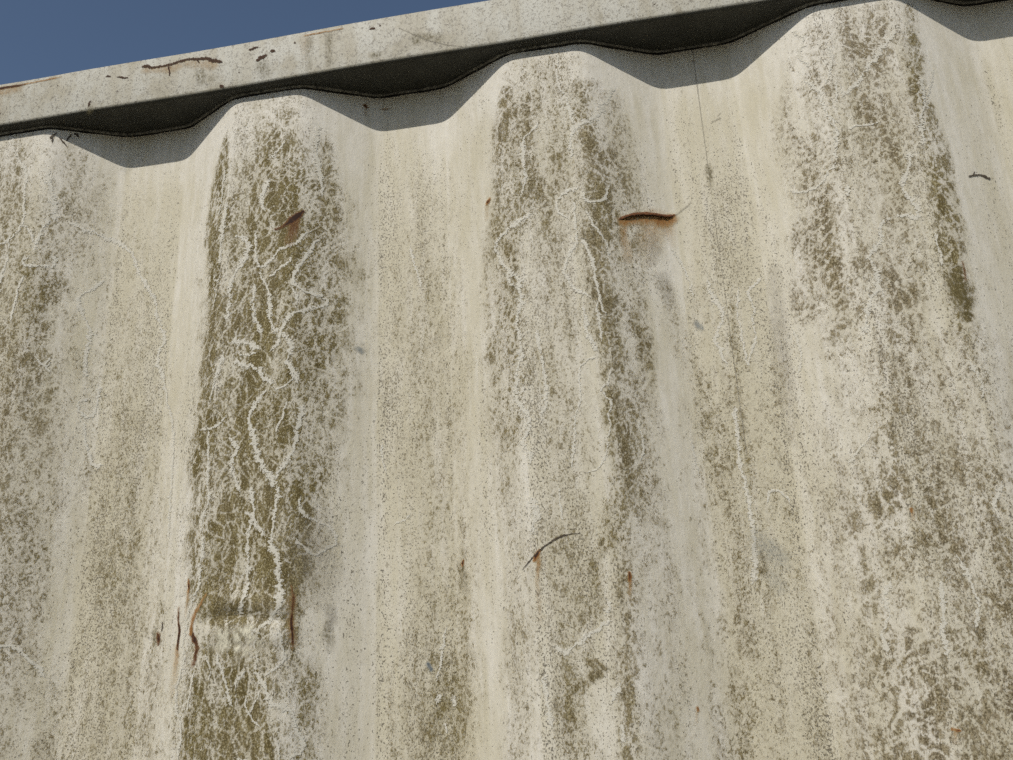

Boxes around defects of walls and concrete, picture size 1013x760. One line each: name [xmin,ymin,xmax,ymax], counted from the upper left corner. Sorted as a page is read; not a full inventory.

water stain [0,135,168,760]
rust [176,594,206,666]
water stain [168,97,366,760]
water stain [480,49,688,760]
water stain [675,287,793,760]
water stain [772,4,1013,760]